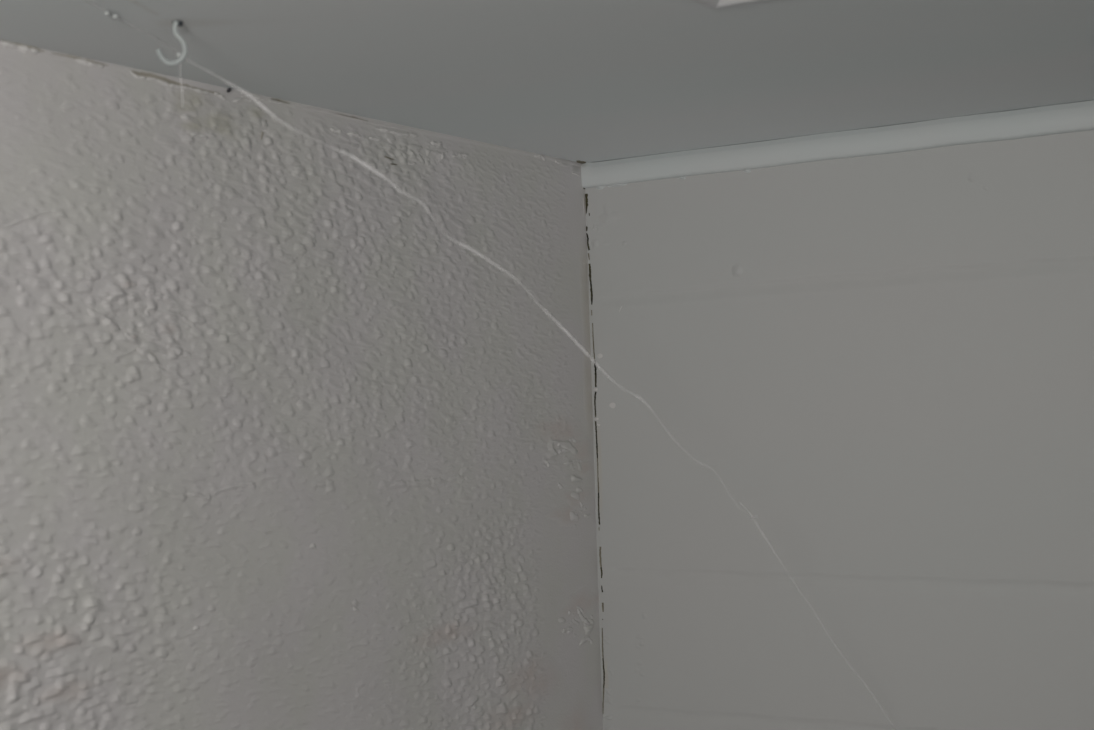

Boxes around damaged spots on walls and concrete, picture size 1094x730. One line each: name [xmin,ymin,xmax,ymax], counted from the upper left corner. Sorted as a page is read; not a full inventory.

crack [577,161,605,714]